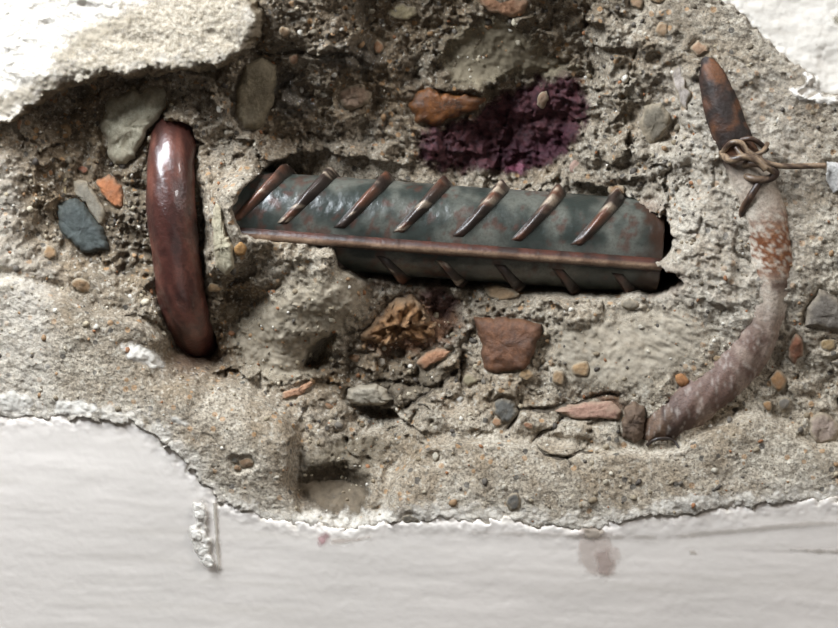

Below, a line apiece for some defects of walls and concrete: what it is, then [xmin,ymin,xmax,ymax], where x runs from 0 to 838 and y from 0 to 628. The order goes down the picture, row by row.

peeling [55,0,249,78]
spalling [803,72,818,88]
peeling [0,78,54,112]
spalling [537,91,549,109]
spalling [790,86,838,104]
spalling [571,361,590,376]
spalling [659,502,699,517]